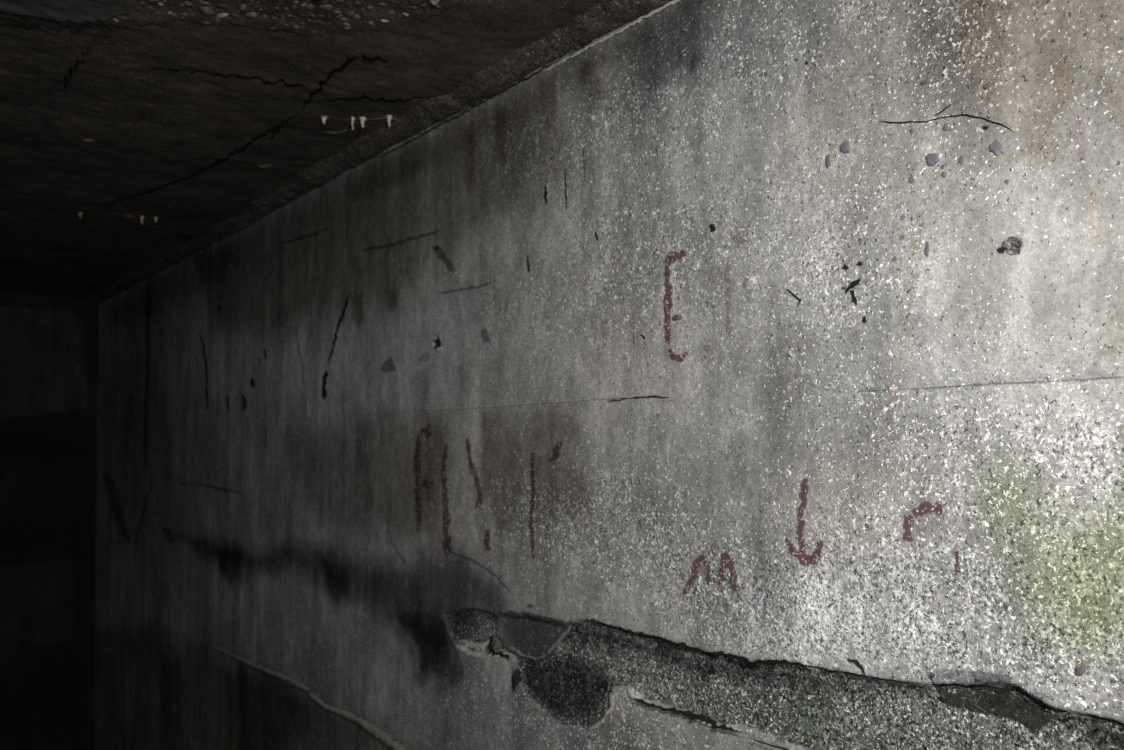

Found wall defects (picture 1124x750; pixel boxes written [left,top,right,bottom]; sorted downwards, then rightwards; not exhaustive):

crack [99,55,424,208]
water stain [320,115,401,134]
crack [377,0,680,159]
spalling [445,609,1124,750]